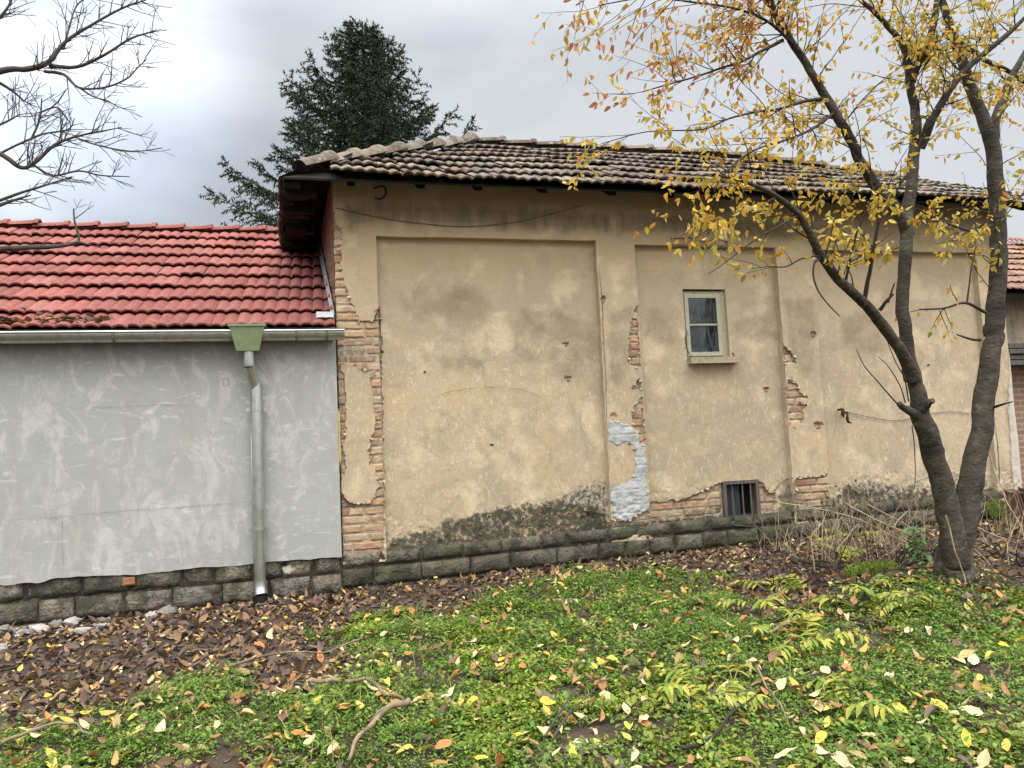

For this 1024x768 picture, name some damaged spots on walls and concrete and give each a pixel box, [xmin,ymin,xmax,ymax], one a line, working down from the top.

flaking render [778,347,797,367]
flaking render [333,213,386,556]
peeling [585,308,723,529]
flaking render [763,380,824,428]
leakage [387,483,611,551]
flaking render [759,483,776,513]
flaking render [795,474,840,510]